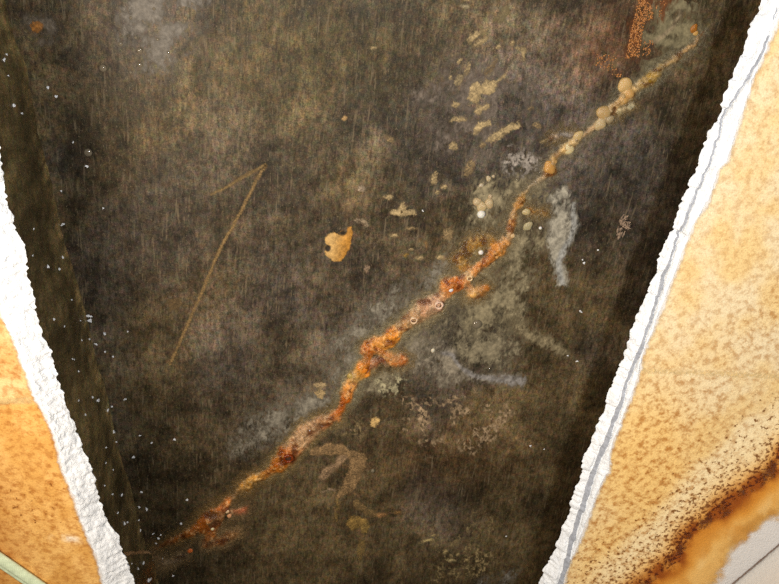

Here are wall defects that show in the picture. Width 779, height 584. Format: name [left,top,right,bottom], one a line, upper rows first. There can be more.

leakage [115,0,193,75]
corrosion [596,0,672,77]
leakage [639,0,702,75]
leakage [411,56,541,161]
spalling [325,218,369,262]
peeling [390,202,417,217]
crack [124,24,707,574]
leakage [361,145,578,444]
leakage [566,29,779,584]
leakage [456,403,512,455]